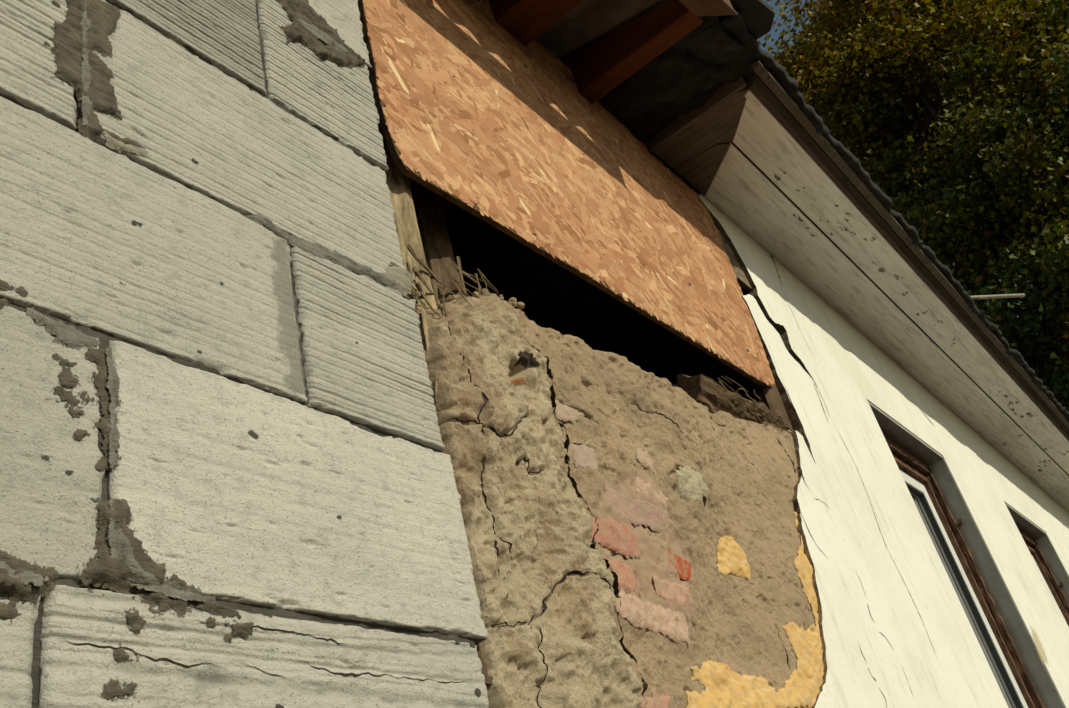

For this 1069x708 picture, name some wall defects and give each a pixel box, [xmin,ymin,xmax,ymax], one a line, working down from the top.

flaking render [554,399,584,424]
crack [631,403,683,433]
crack [60,619,475,683]
crack [438,326,648,708]
flaking render [569,441,696,647]
flaking render [639,693,670,708]
peeling [686,512,824,708]
crack [778,379,941,667]